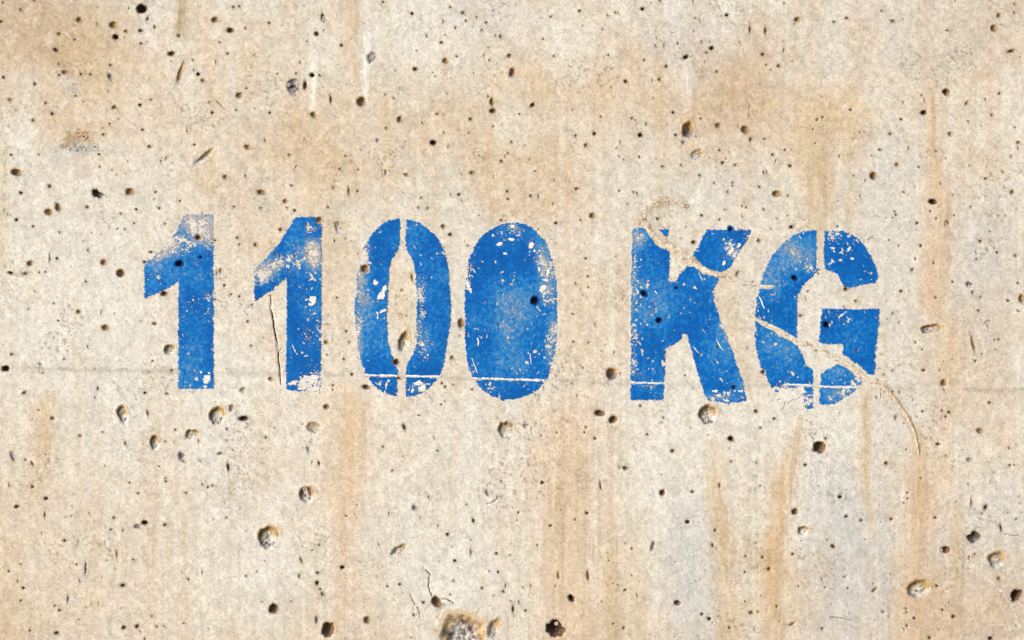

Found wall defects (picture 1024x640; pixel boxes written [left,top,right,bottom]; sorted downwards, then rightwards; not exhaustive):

crack [630,193,774,289]
crack [268,296,283,385]
crack [754,318,920,456]